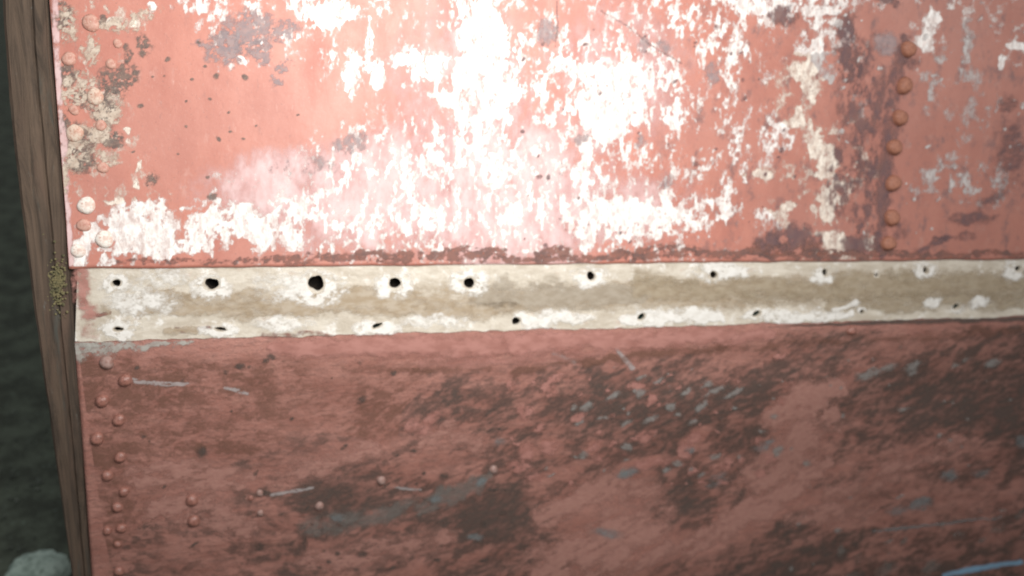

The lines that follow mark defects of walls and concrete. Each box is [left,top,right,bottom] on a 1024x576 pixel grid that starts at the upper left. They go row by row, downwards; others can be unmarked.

corrosion [56,7,153,193]
corrosion [80,356,287,547]
peeling [51,0,885,331]
water stain [75,113,1024,576]
corrosion [116,241,1024,266]
corrosion [511,348,675,376]
peeling [905,153,1008,204]
peeling [910,0,1024,122]